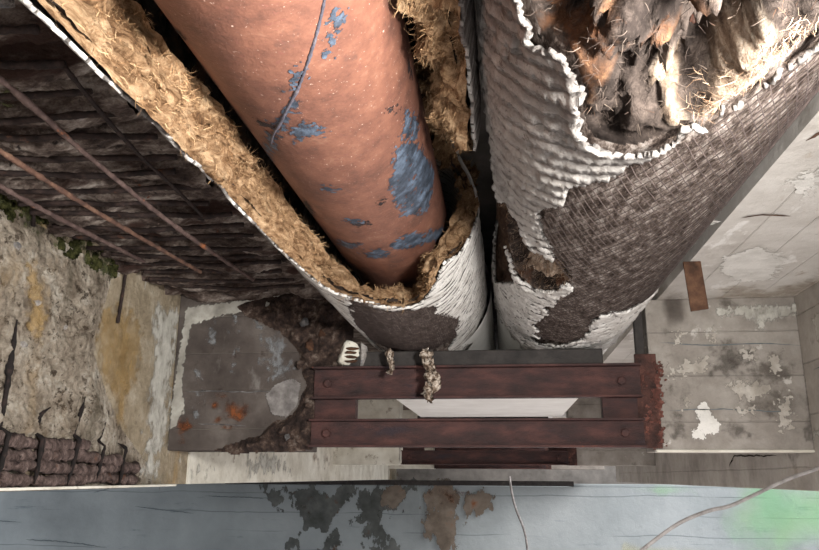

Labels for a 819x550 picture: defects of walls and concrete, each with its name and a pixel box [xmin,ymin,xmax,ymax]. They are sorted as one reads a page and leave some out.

spalling [0,0,355,492]
peeling [767,349,784,377]
peeling [641,355,721,450]
peeling [724,378,798,435]
peeling [259,472,496,550]